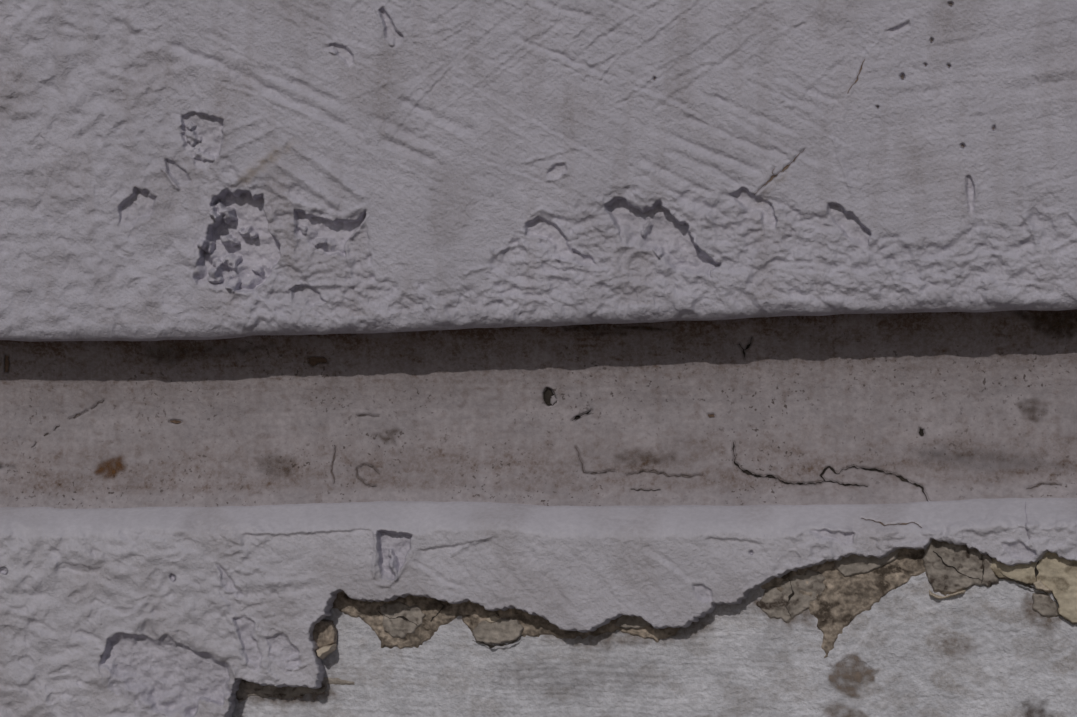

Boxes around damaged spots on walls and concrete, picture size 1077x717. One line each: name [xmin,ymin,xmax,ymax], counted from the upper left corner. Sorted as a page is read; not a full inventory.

crack [575,447,702,491]
crack [732,442,928,528]
peeling [99,530,1077,717]